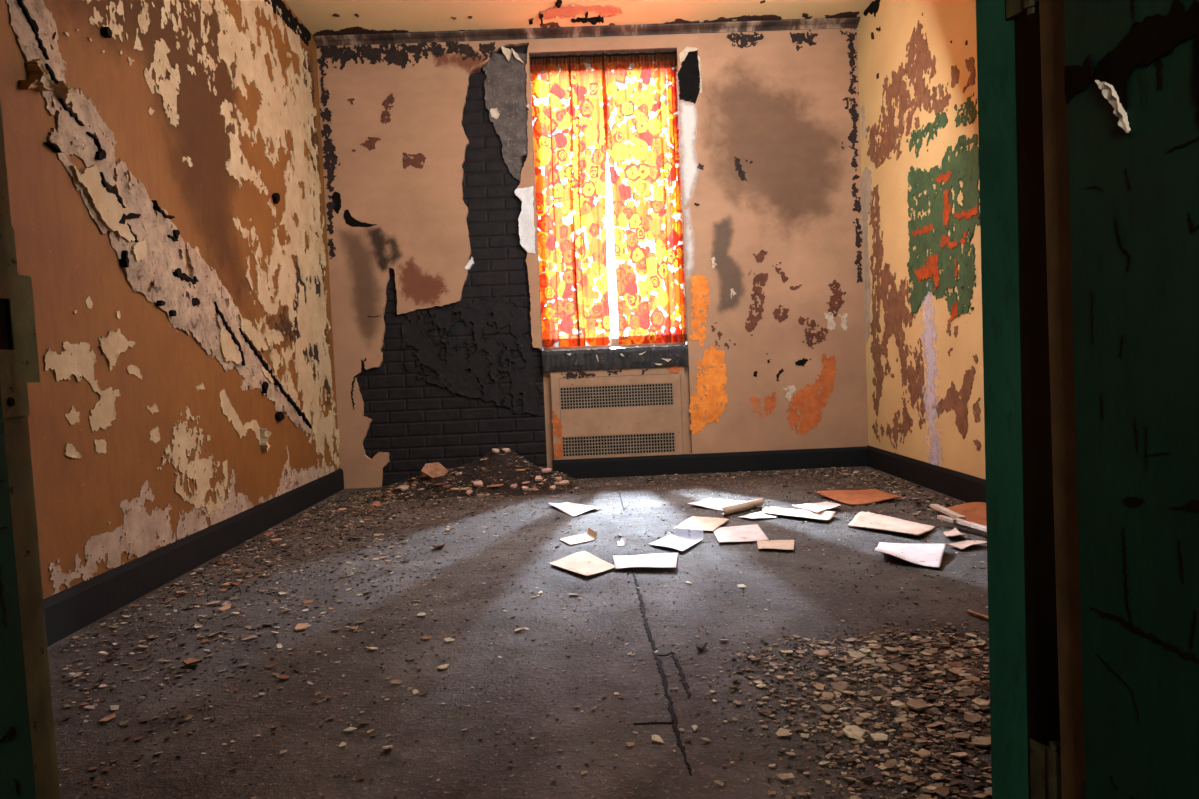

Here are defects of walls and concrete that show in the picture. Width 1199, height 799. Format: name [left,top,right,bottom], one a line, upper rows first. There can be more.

crack [17,0,178,242]
peeling [528,0,623,28]
spalling [678,50,700,104]
peeling [653,0,782,48]
crack [180,273,313,429]
spalling [43,0,565,596]
peeling [689,257,736,434]
peeling [790,0,981,453]
crack [628,553,692,776]